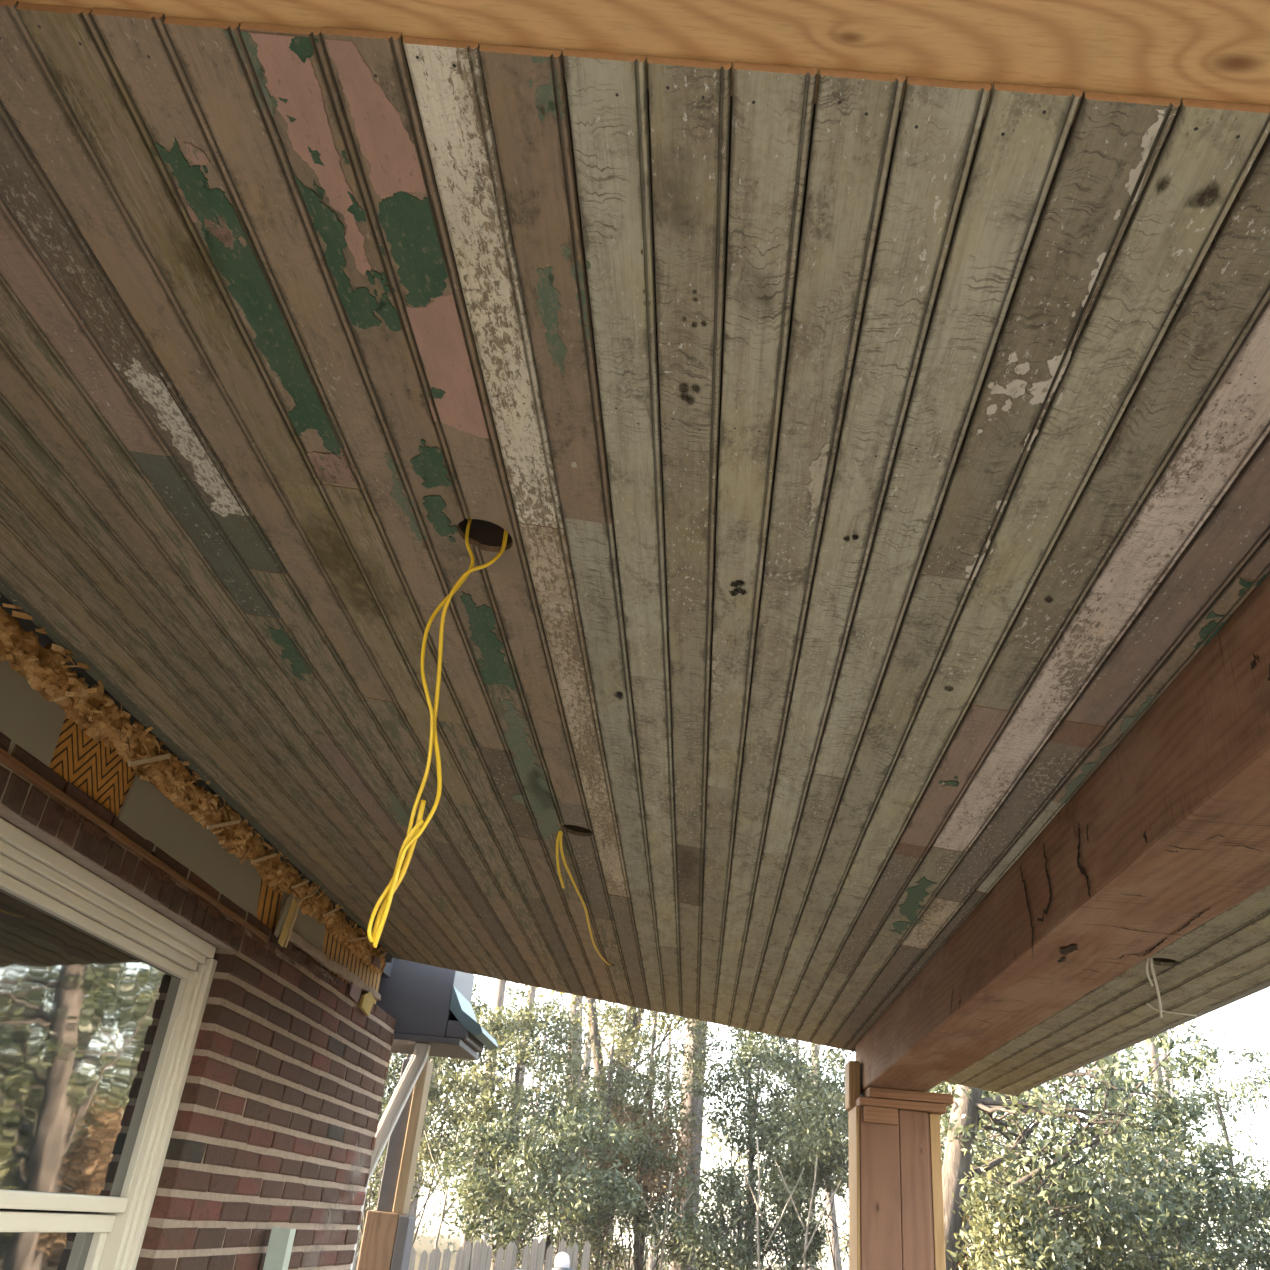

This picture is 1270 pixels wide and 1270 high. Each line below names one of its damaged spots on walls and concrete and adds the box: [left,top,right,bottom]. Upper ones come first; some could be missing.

peeling [528,56,567,123]
peeling [223,30,494,438]
peeling [150,139,362,490]
peeling [986,252,1115,453]
peeling [113,357,252,517]
peeling [410,439,458,543]
peeling [965,526,993,589]
peeling [460,592,560,841]
peeling [888,876,936,935]